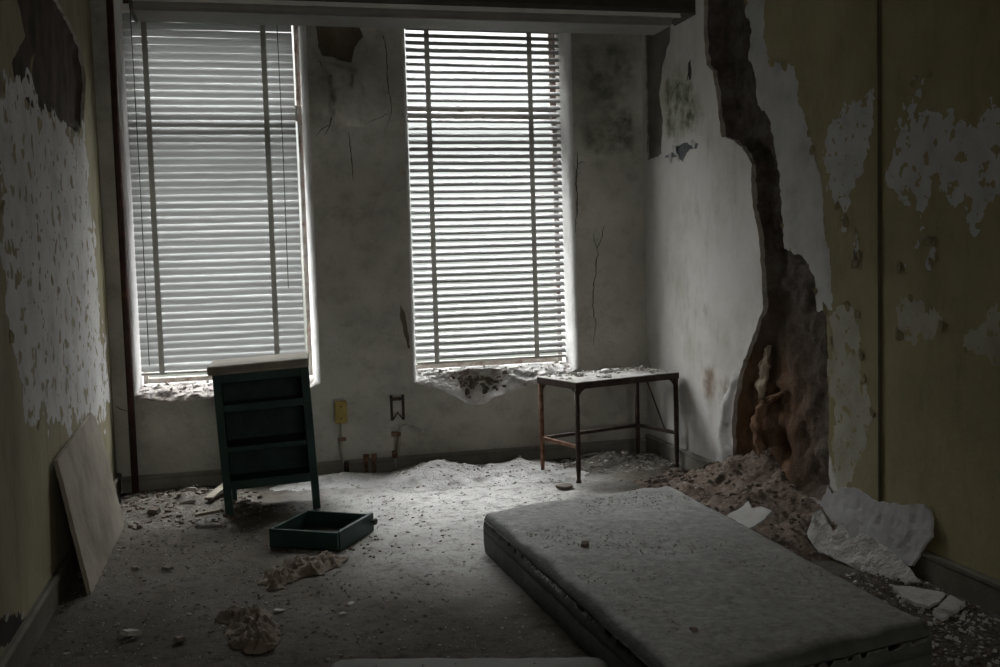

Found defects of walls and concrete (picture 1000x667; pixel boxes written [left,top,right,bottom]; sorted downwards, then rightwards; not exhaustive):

peeling [0,0,111,437]
spalling [316,26,363,63]
crack [315,35,392,182]
crack [575,152,605,346]
spalling [644,26,698,163]
spalling [704,0,875,502]
peeling [885,71,1000,271]
spalling [135,380,214,402]
spalling [414,361,578,405]